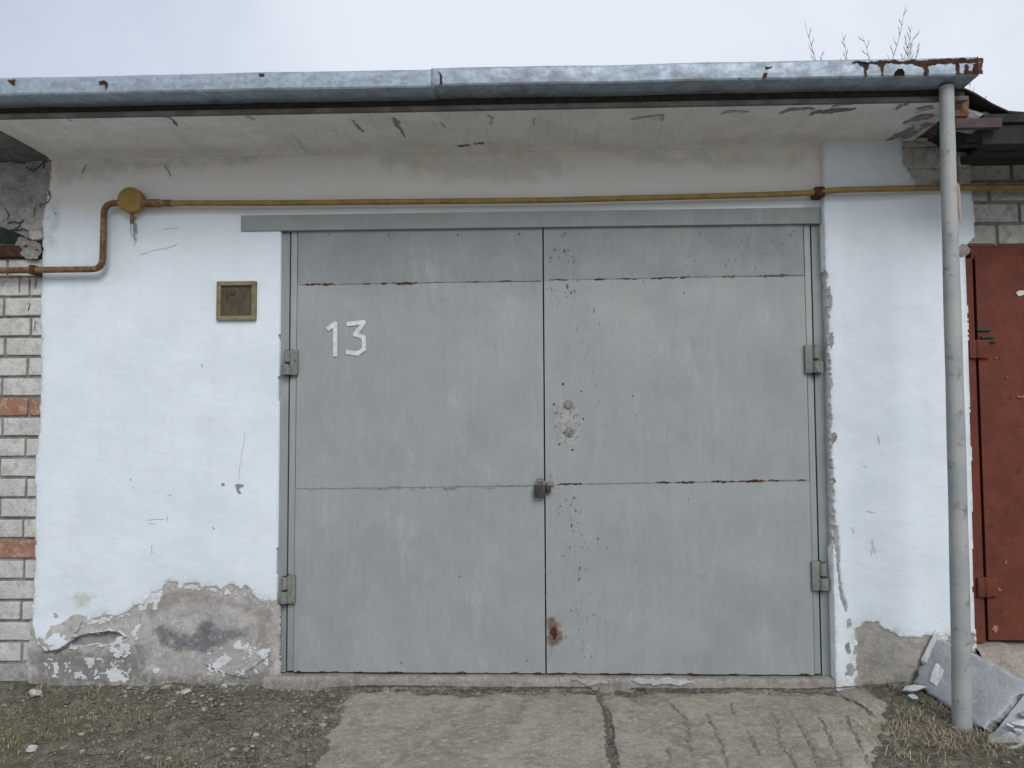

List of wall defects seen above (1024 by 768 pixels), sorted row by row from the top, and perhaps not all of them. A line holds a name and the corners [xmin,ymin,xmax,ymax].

rust [853,57,984,77]
flaking render [15,230,44,260]
flaking render [822,272,932,688]
flaking render [26,581,282,687]
damp [157,620,272,672]
rust [547,594,594,658]